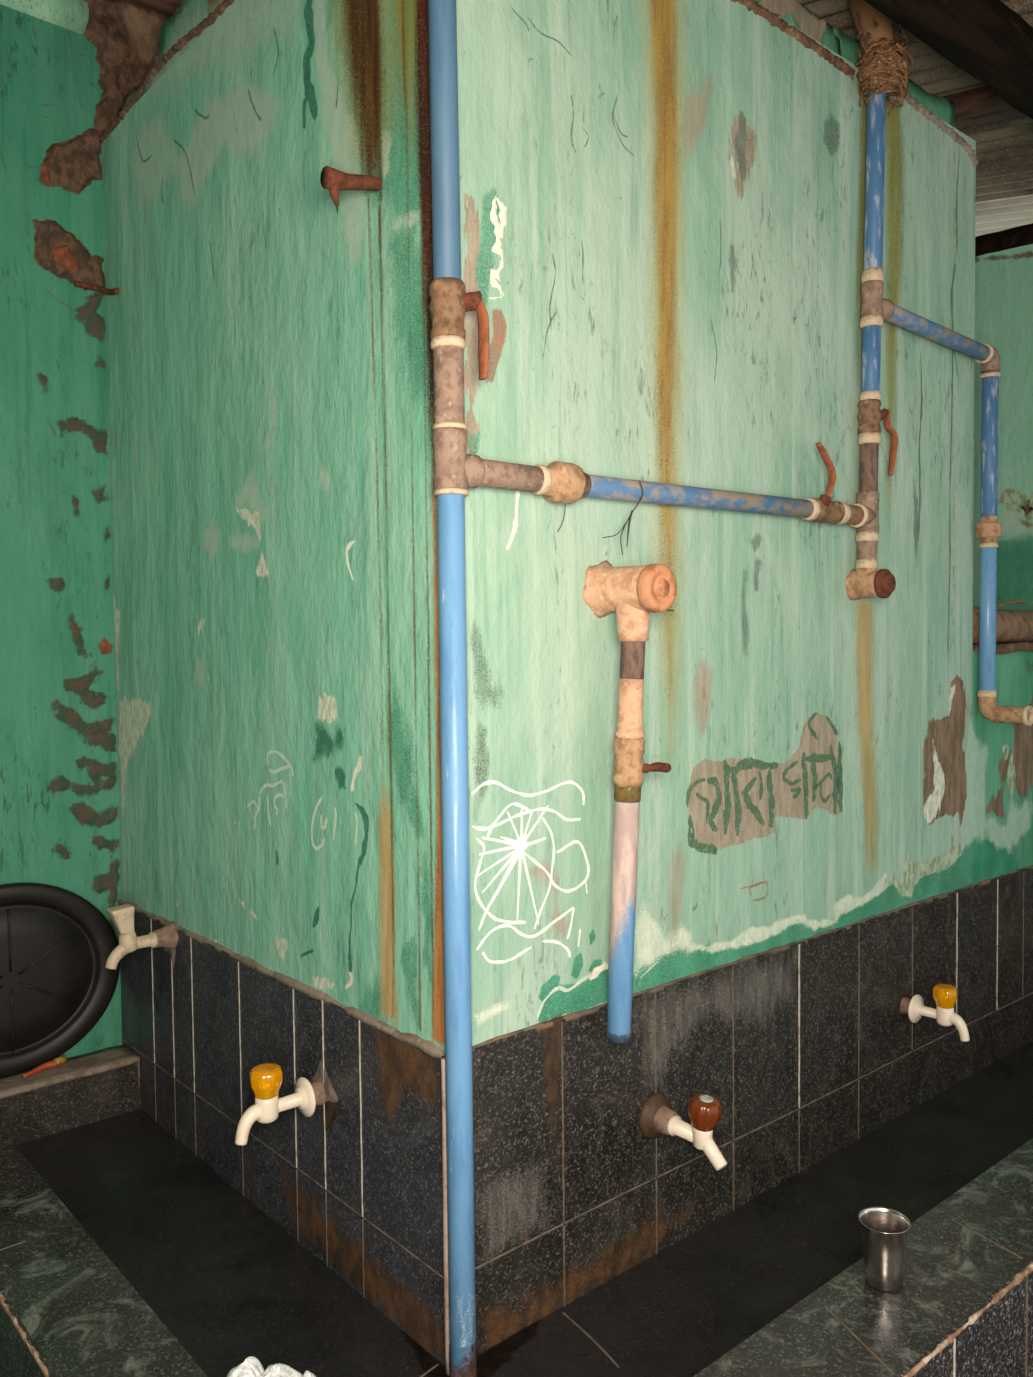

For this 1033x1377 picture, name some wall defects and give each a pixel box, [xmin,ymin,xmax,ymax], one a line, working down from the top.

spalling [39,0,235,195]
spalling [31,219,106,369]
rust [633,0,694,486]
spalling [55,385,111,543]
spalling [46,577,151,944]
rust [323,0,445,1130]
rust [642,503,691,791]
peeling [686,712,842,850]
rust [852,598,882,880]
peeling [923,676,1033,855]
leakage [475,1157,560,1272]
leakage [476,1207,695,1352]